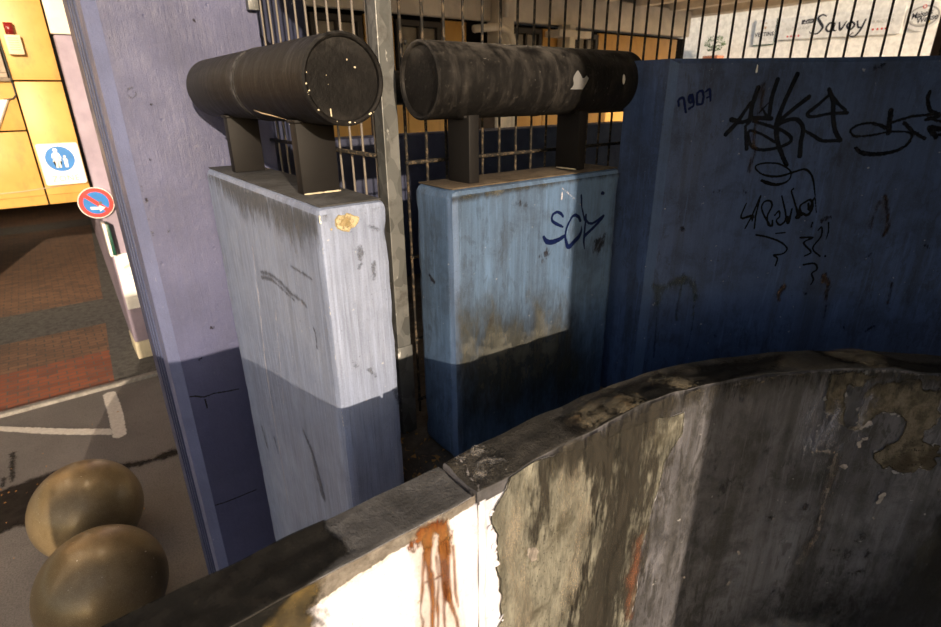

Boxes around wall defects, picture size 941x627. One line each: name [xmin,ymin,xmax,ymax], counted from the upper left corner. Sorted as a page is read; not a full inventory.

spalling [319,213,359,232]
crack [189,389,238,408]
peeling [823,370,941,475]
rust [408,520,459,627]
damp [506,470,550,596]
damp [565,436,683,627]